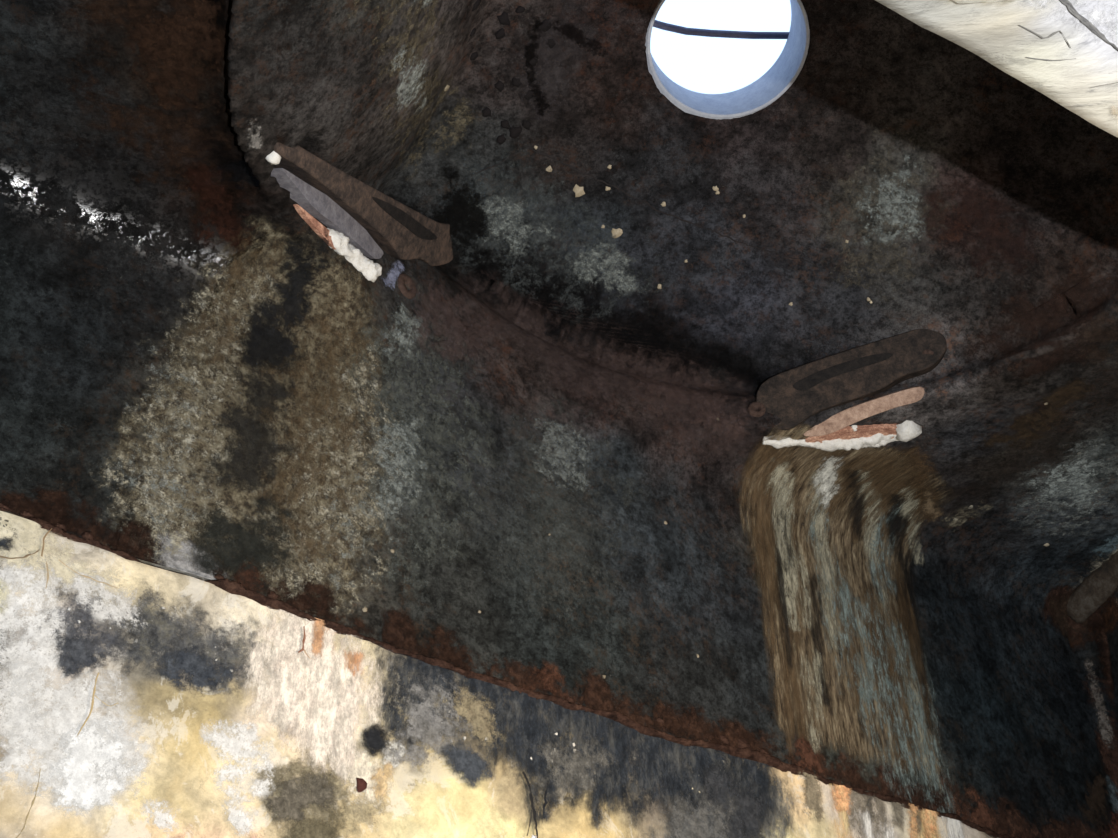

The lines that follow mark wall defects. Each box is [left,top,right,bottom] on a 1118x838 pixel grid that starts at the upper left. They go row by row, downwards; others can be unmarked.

crack [1019,0,1118,61]
crack [0,528,119,589]
corrosion [0,487,167,566]
damp [0,219,825,838]
corrosion [212,557,491,677]
damp [741,425,965,838]
crack [77,673,118,736]
corrosion [1042,584,1118,838]
crack [16,769,41,838]
crack [522,772,549,838]
corrosion [784,738,952,838]